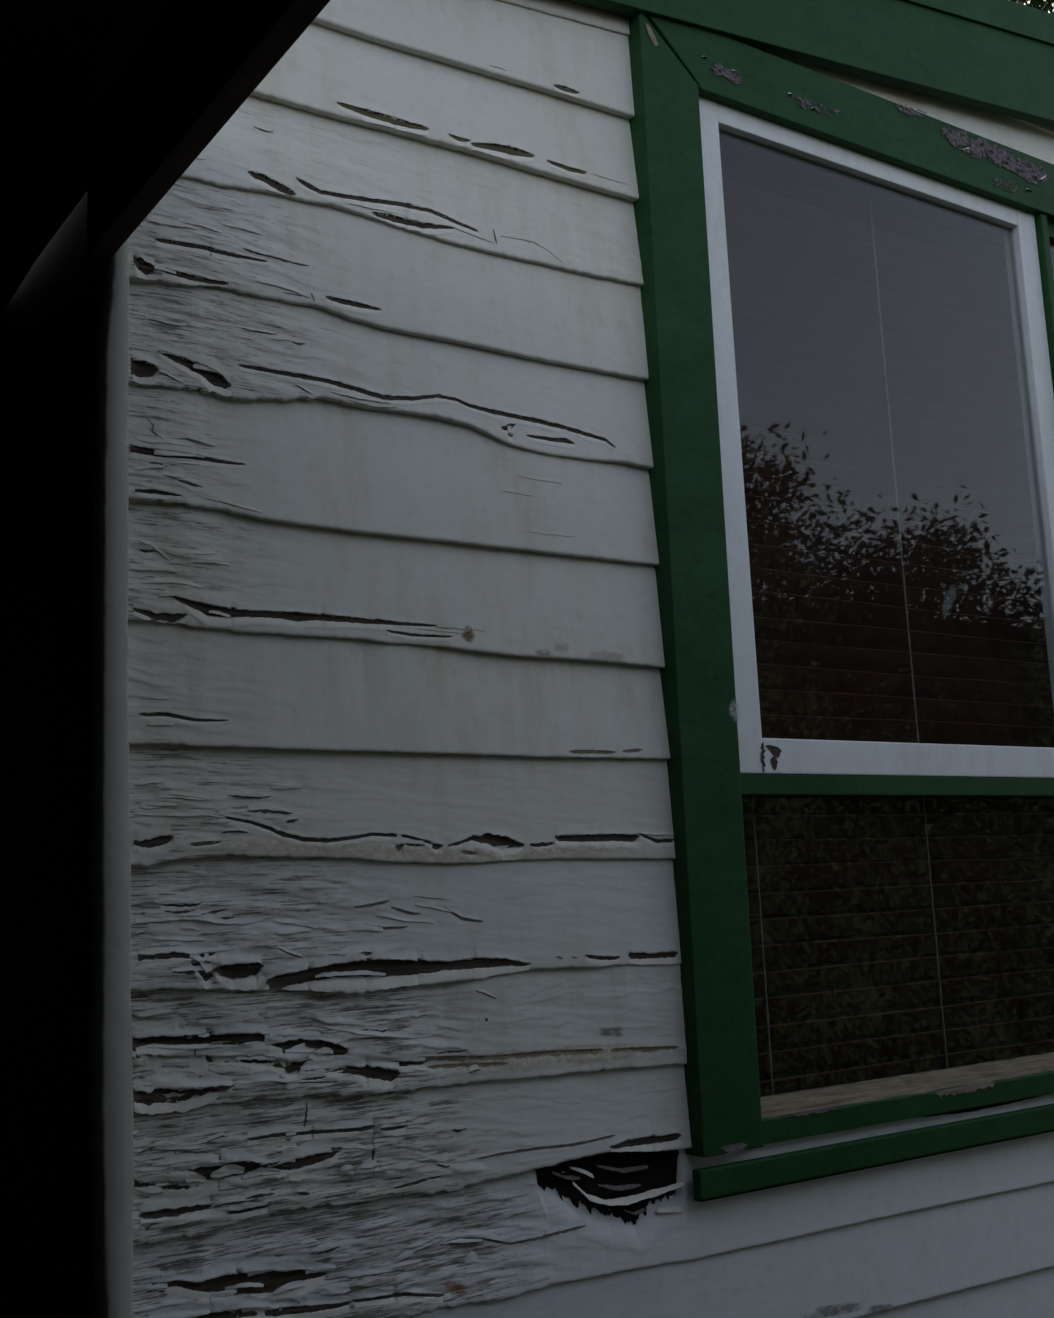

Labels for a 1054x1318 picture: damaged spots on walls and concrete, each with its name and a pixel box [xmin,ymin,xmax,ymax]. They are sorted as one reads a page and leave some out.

peeling [702,56,742,84]
peeling [941,126,1051,192]
crack [455,228,558,259]
peeling [134,791,207,857]
peeling [191,781,639,861]
peeling [135,897,529,991]
peeling [556,939,678,966]
peeling [132,1006,678,1094]
peeling [135,1117,406,1234]
peeling [393,1159,452,1193]
hole [535,1121,686,1225]
peeling [147,1238,442,1318]